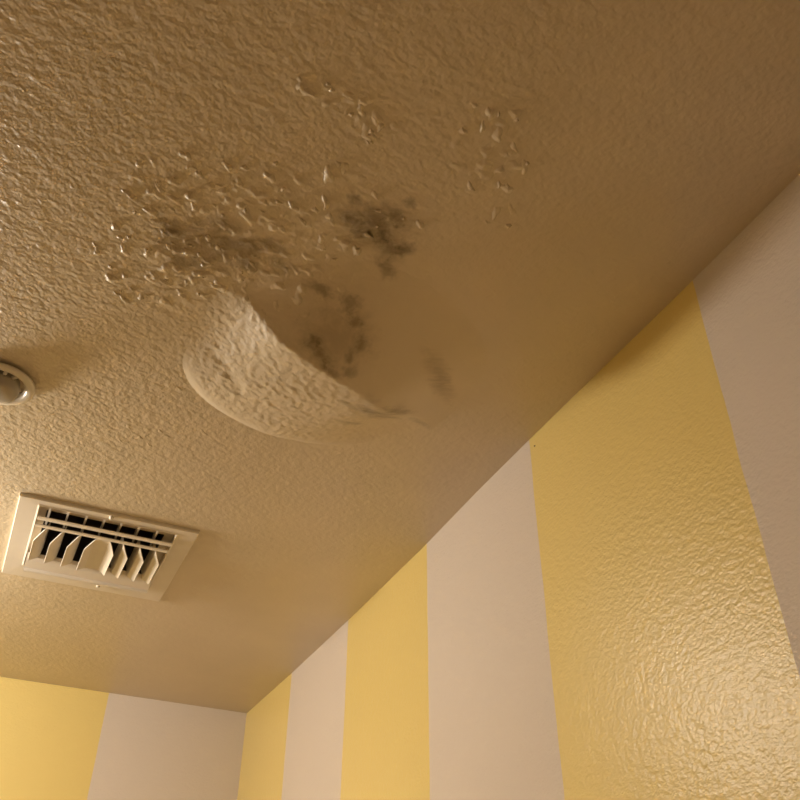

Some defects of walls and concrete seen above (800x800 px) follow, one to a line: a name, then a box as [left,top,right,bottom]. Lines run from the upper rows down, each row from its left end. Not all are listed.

peeling [105,151,380,323]